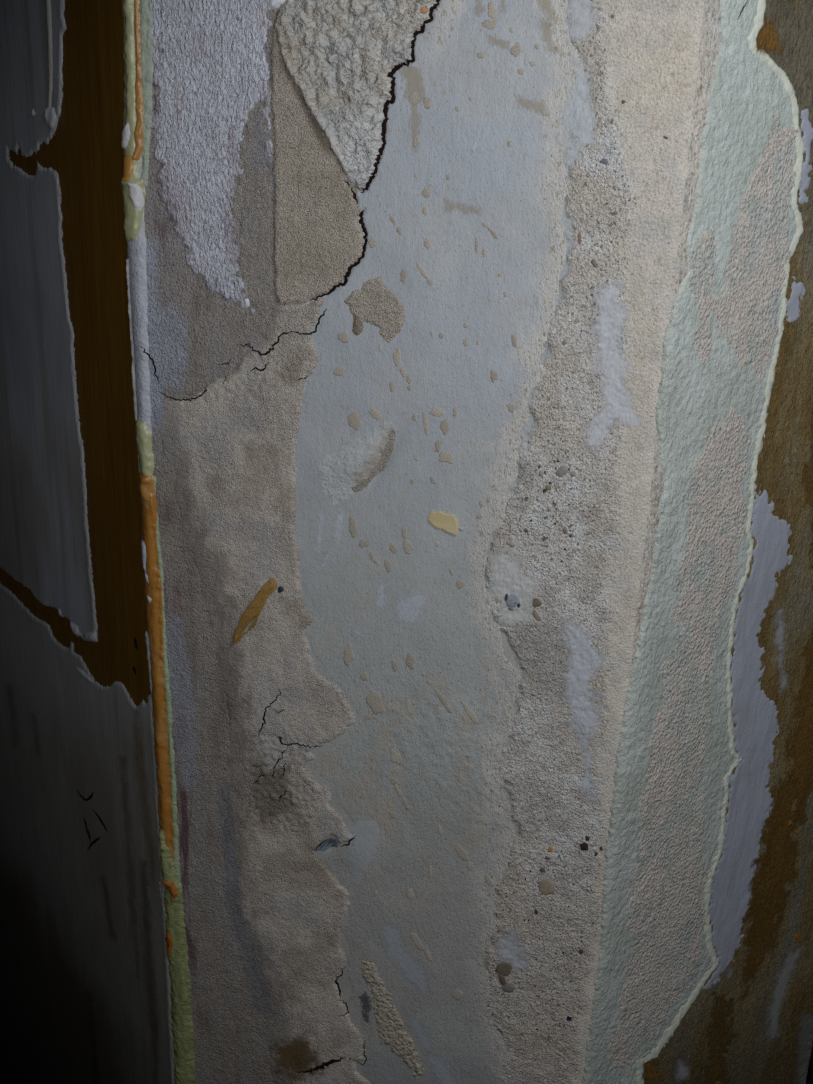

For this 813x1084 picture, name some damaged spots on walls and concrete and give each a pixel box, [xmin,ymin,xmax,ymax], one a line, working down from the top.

corrosion [757,19,783,53]
peeling [31,107,57,129]
peeling [127,183,145,211]
crack [141,0,440,402]
peeling [141,539,152,603]
spalling [151,0,584,1084]
peeling [579,0,805,1084]
crack [251,690,323,799]
corrosion [703,631,813,1084]